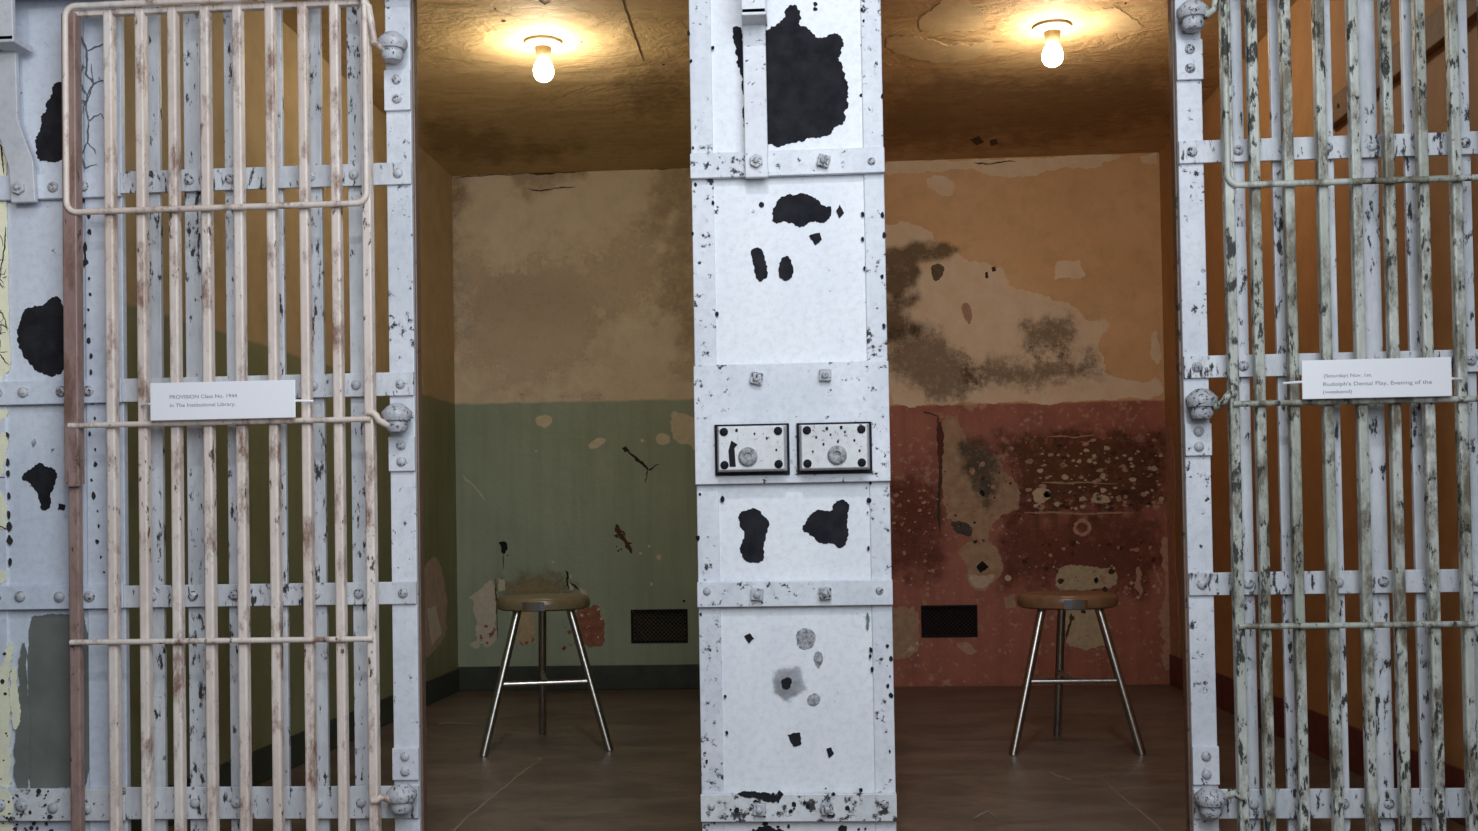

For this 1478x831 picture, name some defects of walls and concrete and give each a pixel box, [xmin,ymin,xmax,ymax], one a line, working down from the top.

crack [622,0,665,65]
peeling [733,26,744,127]
peeling [766,2,862,147]
crack [0,140,13,583]
peeling [17,296,64,377]
peeling [83,199,93,375]
water stain [886,242,976,400]
peeling [88,403,105,573]
peeling [759,193,1170,706]
peeling [562,605,605,650]
crack [0,642,64,831]
peeling [788,732,801,747]